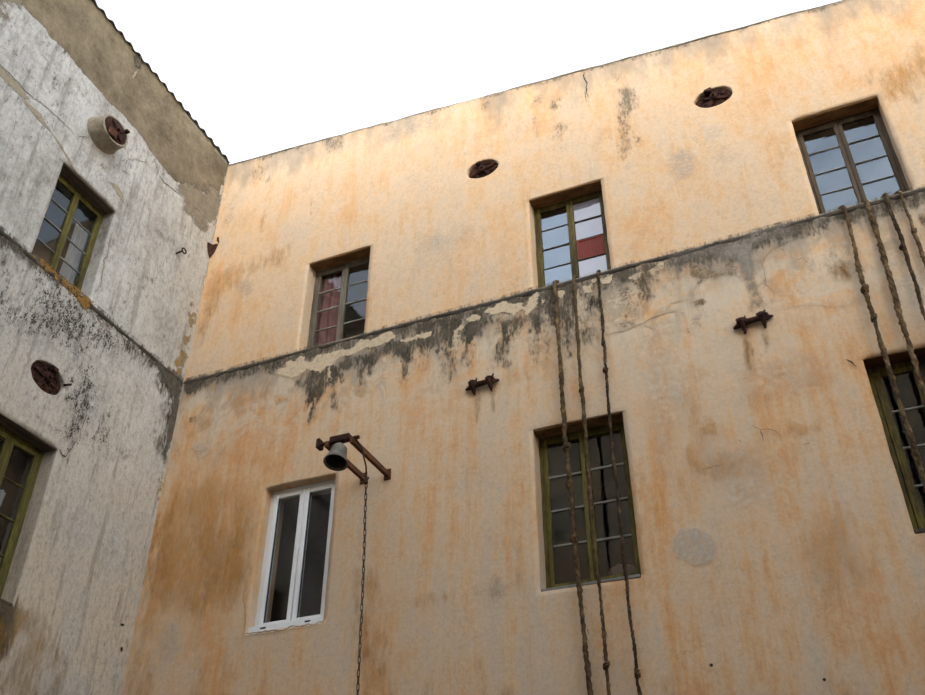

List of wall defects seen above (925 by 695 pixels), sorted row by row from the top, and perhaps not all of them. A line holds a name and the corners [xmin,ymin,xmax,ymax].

damp [618,89,635,138]
peeling [274,331,432,381]
damp [0,188,925,500]